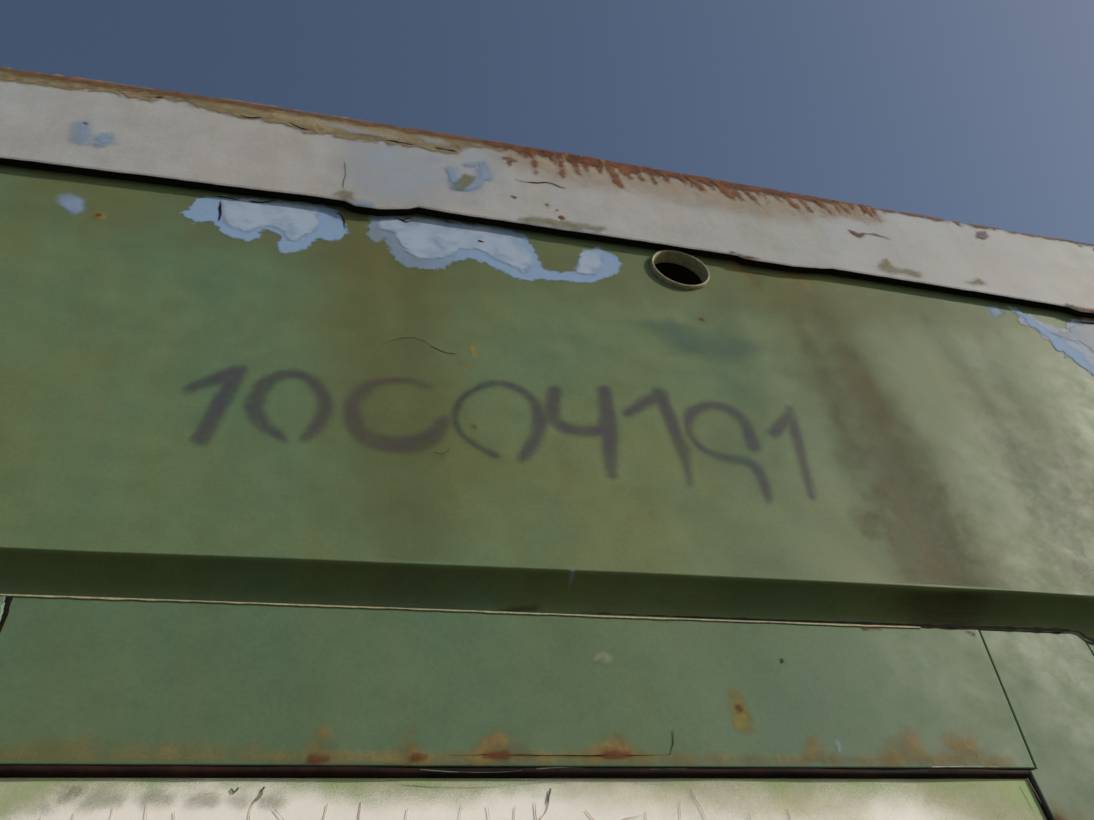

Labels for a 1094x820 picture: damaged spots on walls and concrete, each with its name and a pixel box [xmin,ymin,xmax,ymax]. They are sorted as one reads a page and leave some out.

rust [0,67,1094,249]
peeling [180,188,623,284]
water stain [0,165,1032,351]
peeling [988,305,1094,375]
rust [0,721,1018,767]
crack [249,787,284,820]
crack [488,788,551,820]